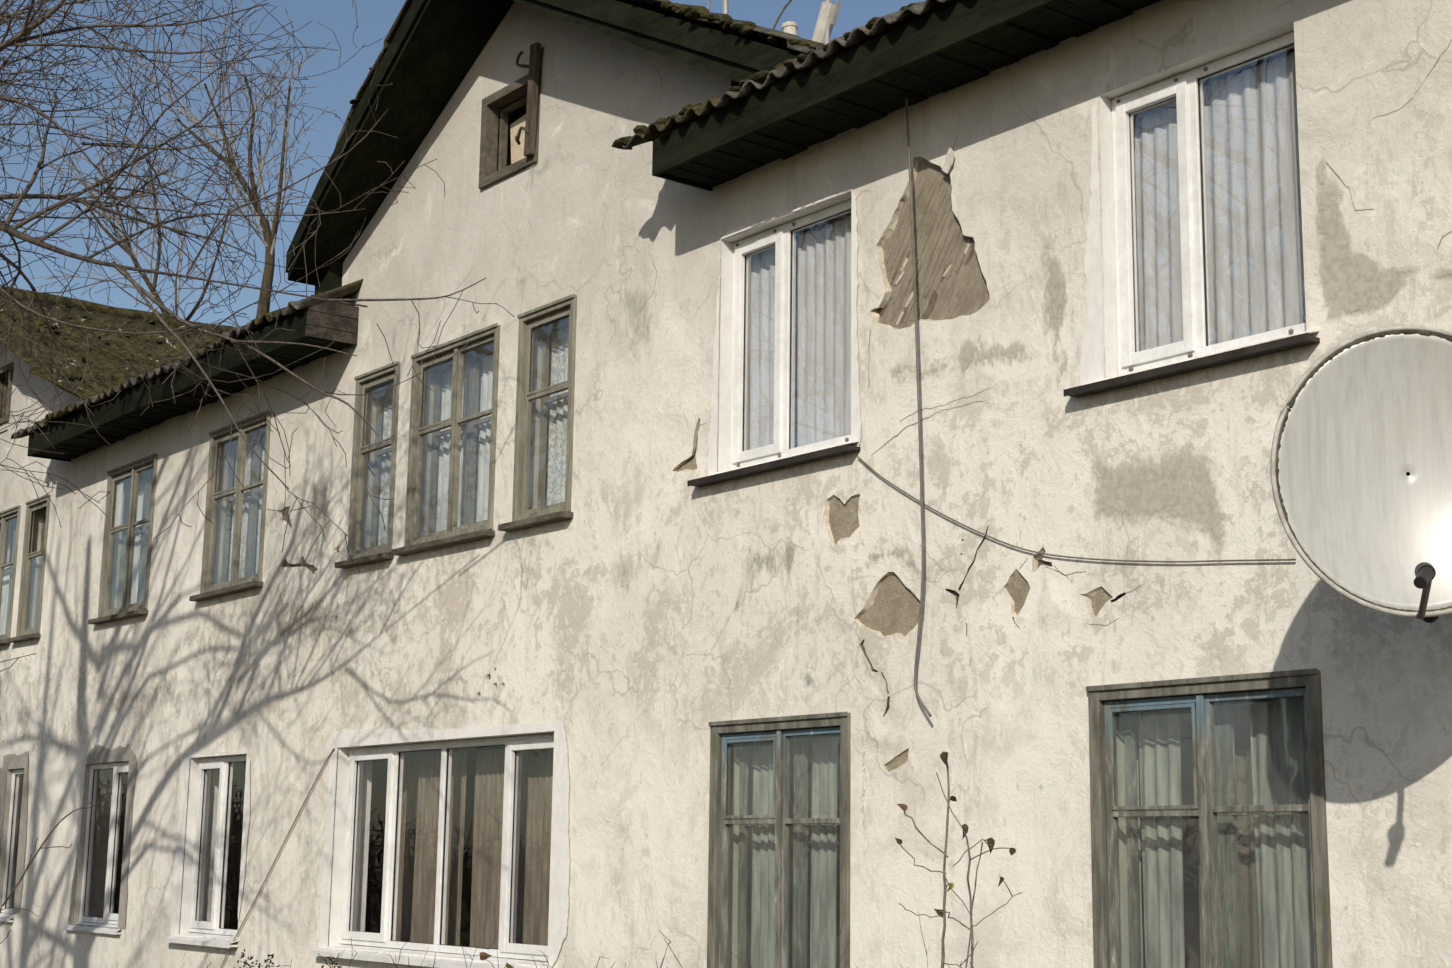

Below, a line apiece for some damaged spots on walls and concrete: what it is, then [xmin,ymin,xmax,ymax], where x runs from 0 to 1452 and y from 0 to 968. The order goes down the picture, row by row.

crack [1372,39,1452,119]
crack [1325,162,1374,211]
spalling [870,137,990,330]
spalling [823,494,860,549]
spalling [854,572,920,639]
spalling [1003,547,1052,628]
spalling [1080,585,1141,619]